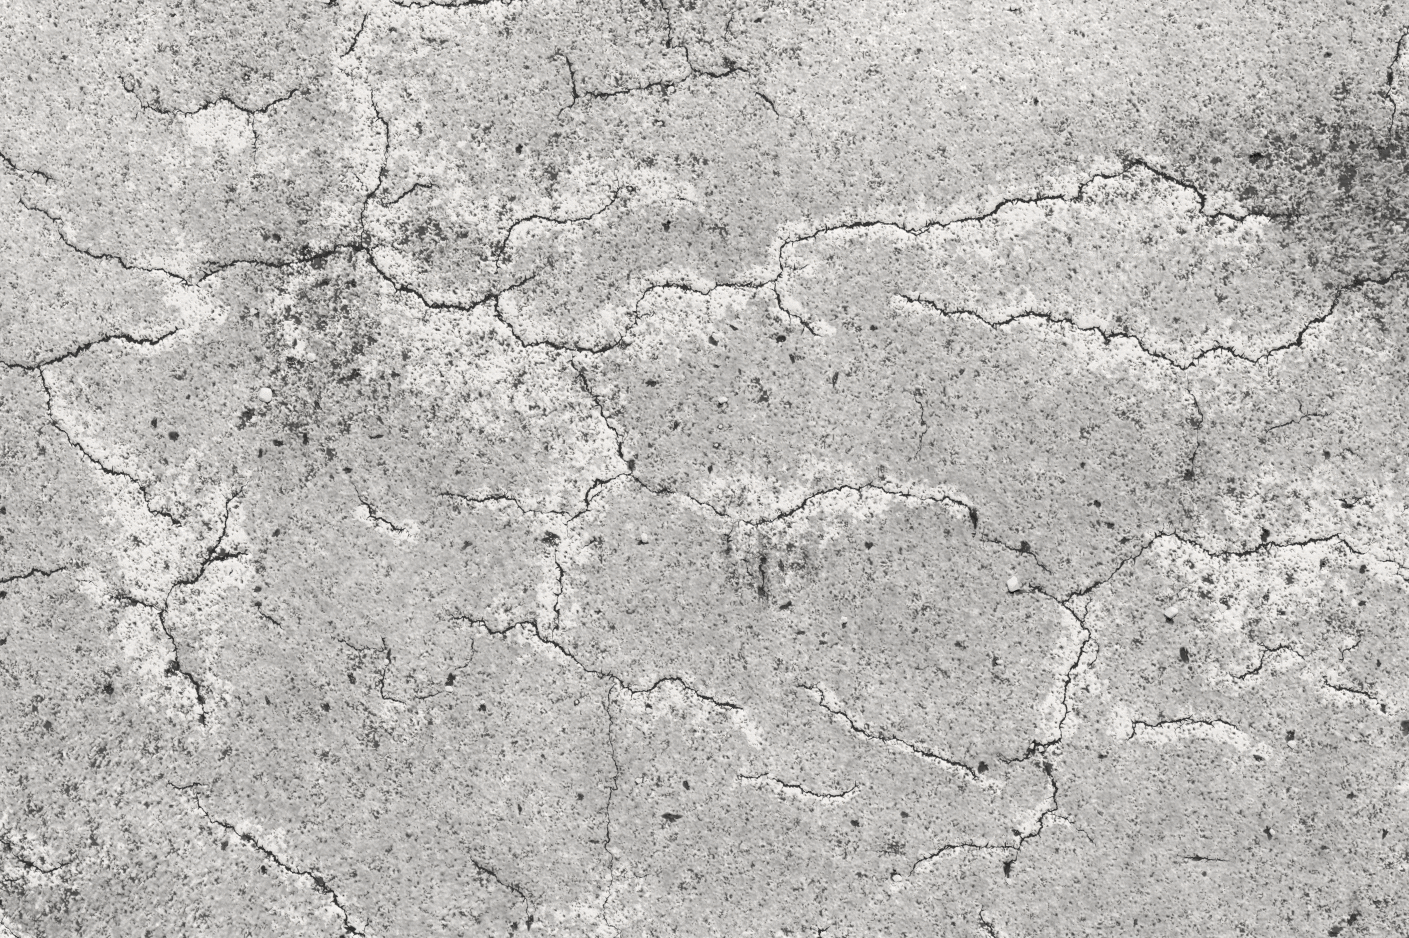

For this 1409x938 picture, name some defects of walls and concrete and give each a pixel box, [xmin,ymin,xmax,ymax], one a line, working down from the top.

crack [1383,26,1409,150]
crack [0,0,1304,597]
crack [895,269,1409,473]
crack [0,839,76,882]
crack [0,481,249,727]
crack [166,781,369,938]
crack [330,634,445,704]
crack [450,549,744,938]
crack [737,772,858,800]
crack [794,681,978,779]
crack [979,903,996,938]
crack [908,523,1409,877]